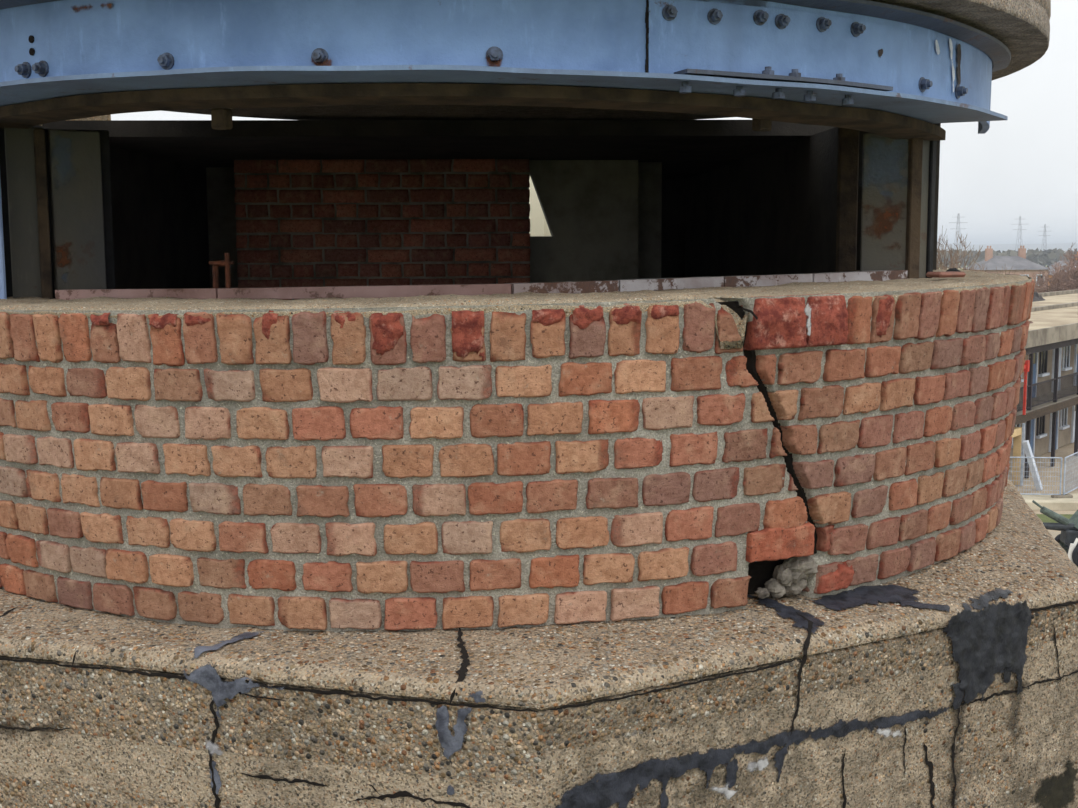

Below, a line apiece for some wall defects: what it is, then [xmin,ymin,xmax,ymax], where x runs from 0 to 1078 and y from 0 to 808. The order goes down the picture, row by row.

crack [716,302,817,553]
crack [0,612,813,808]
leakage [555,707,949,808]